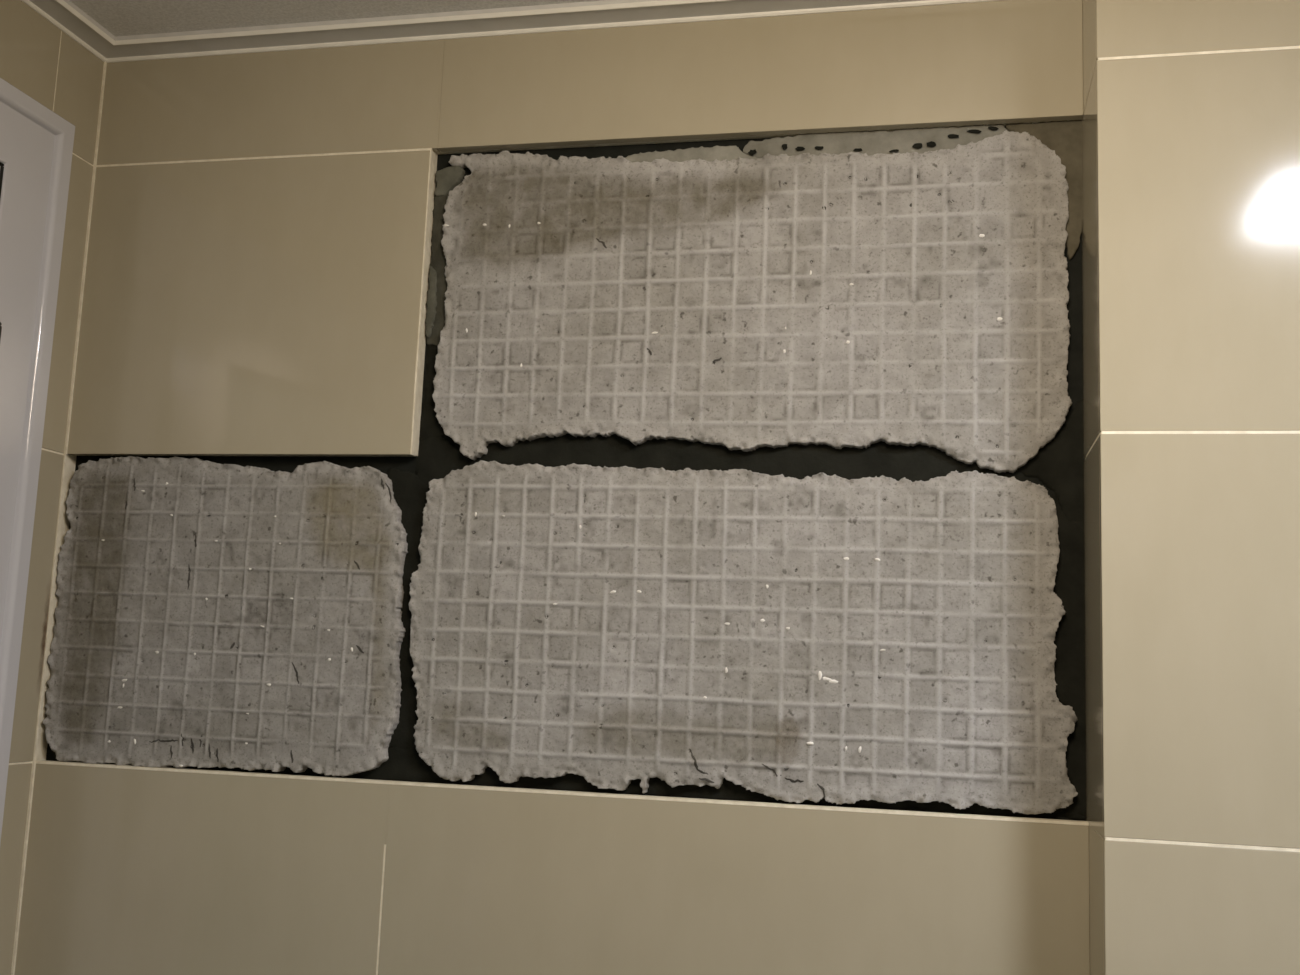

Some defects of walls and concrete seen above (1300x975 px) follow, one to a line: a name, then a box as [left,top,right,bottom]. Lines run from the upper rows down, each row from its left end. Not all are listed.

spalling [42,125,1078,815]